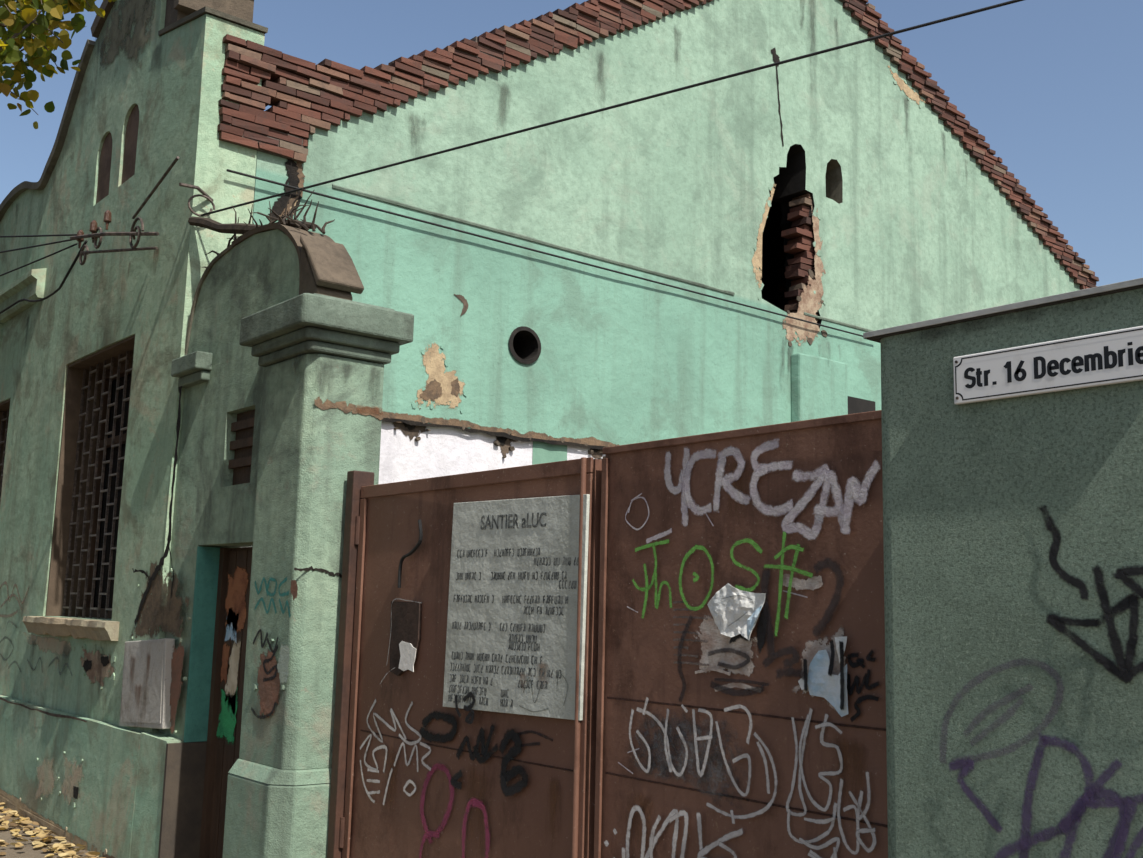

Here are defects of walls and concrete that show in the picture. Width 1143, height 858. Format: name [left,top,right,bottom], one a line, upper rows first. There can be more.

crack [268,159,305,220]
spalling [752,184,776,300]
spalling [782,206,827,346]
spalling [314,343,619,460]
crack [294,566,342,578]